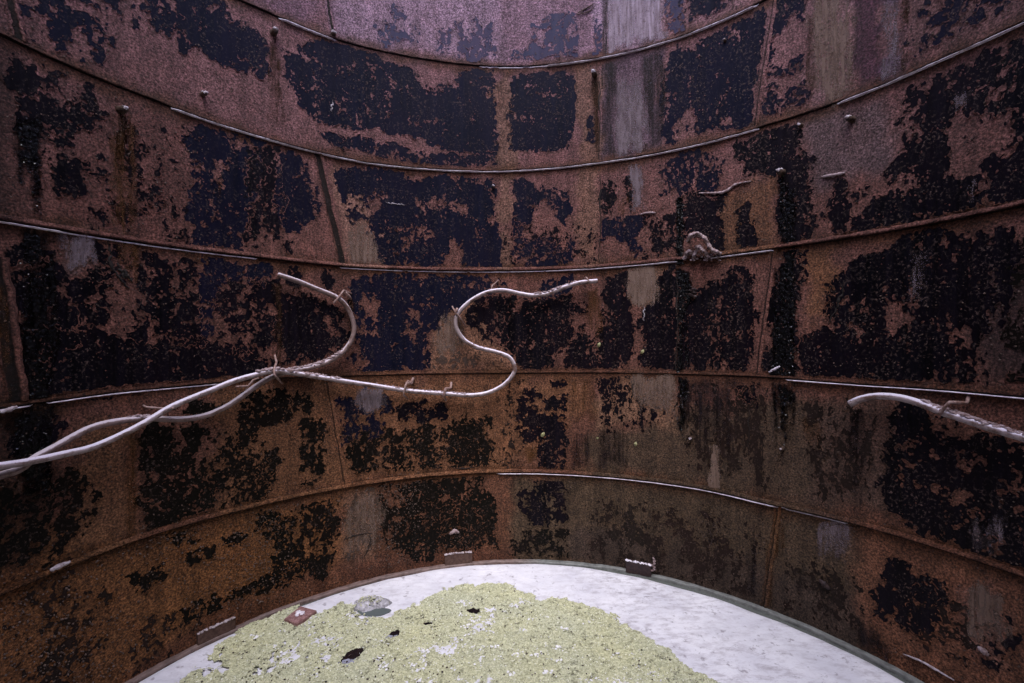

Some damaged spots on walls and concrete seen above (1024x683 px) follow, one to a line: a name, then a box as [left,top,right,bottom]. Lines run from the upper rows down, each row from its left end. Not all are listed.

rust [591,78,599,153]
leakage [601,0,667,210]
leakage [807,0,855,107]
peeling [0,0,1024,493]
rust [699,181,751,195]
peeling [123,386,344,678]
rust [255,348,343,379]
peeling [333,377,571,565]
peeling [801,395,1024,569]
rust [920,399,1024,436]
peeling [781,555,1024,675]
rust [903,654,954,681]